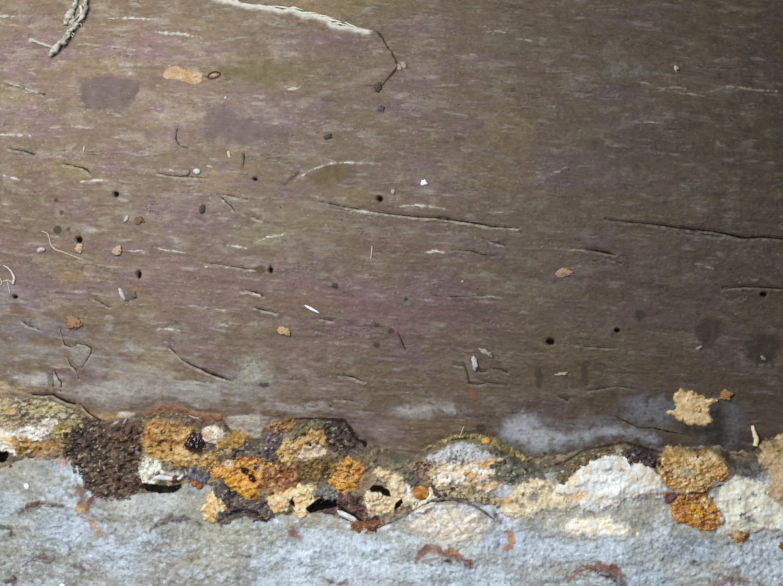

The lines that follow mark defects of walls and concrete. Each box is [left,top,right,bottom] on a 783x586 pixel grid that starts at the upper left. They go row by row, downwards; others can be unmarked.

crack [328,203,517,257]
crack [608,219,783,242]
peeling [151,403,263,449]
spalling [308,416,359,453]
leakage [501,412,657,468]
spalling [60,416,184,502]
spalling [241,466,256,483]
spalling [621,447,674,477]
spalling [288,494,347,513]
spalling [365,485,403,510]